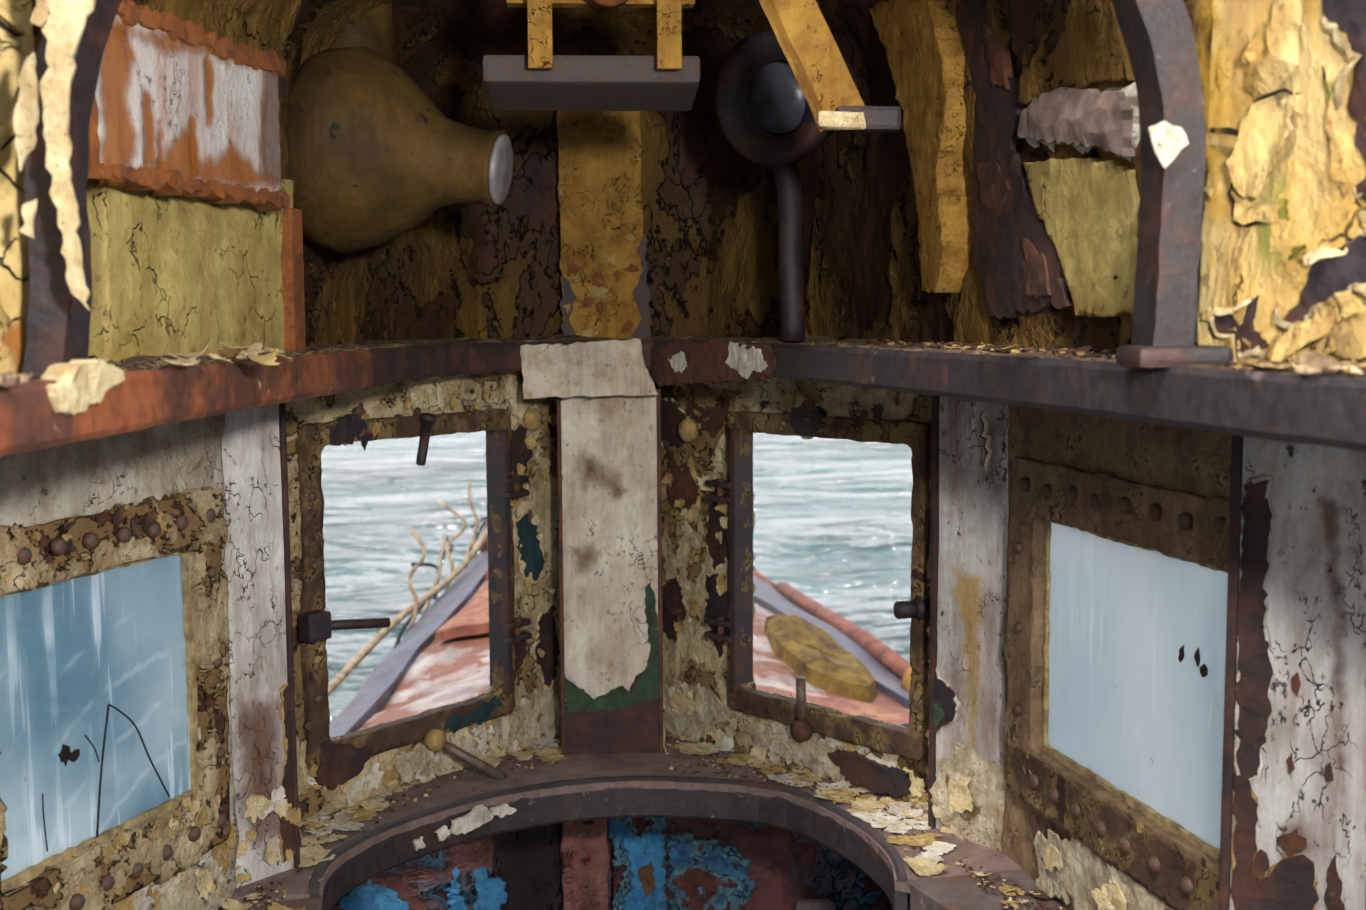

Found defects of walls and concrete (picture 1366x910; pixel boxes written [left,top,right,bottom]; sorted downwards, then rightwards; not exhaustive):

crack [0,3,26,36]
rust [101,22,280,188]
crack [0,133,25,209]
rust [4,327,22,361]
peeling [0,345,33,387]
spalling [322,396,422,451]
peeling [113,507,176,540]
peeling [30,531,76,567]
spalling [444,391,1073,910]
peeling [103,684,434,910]
peeling [53,882,91,894]
peeling [1091,880,1127,910]